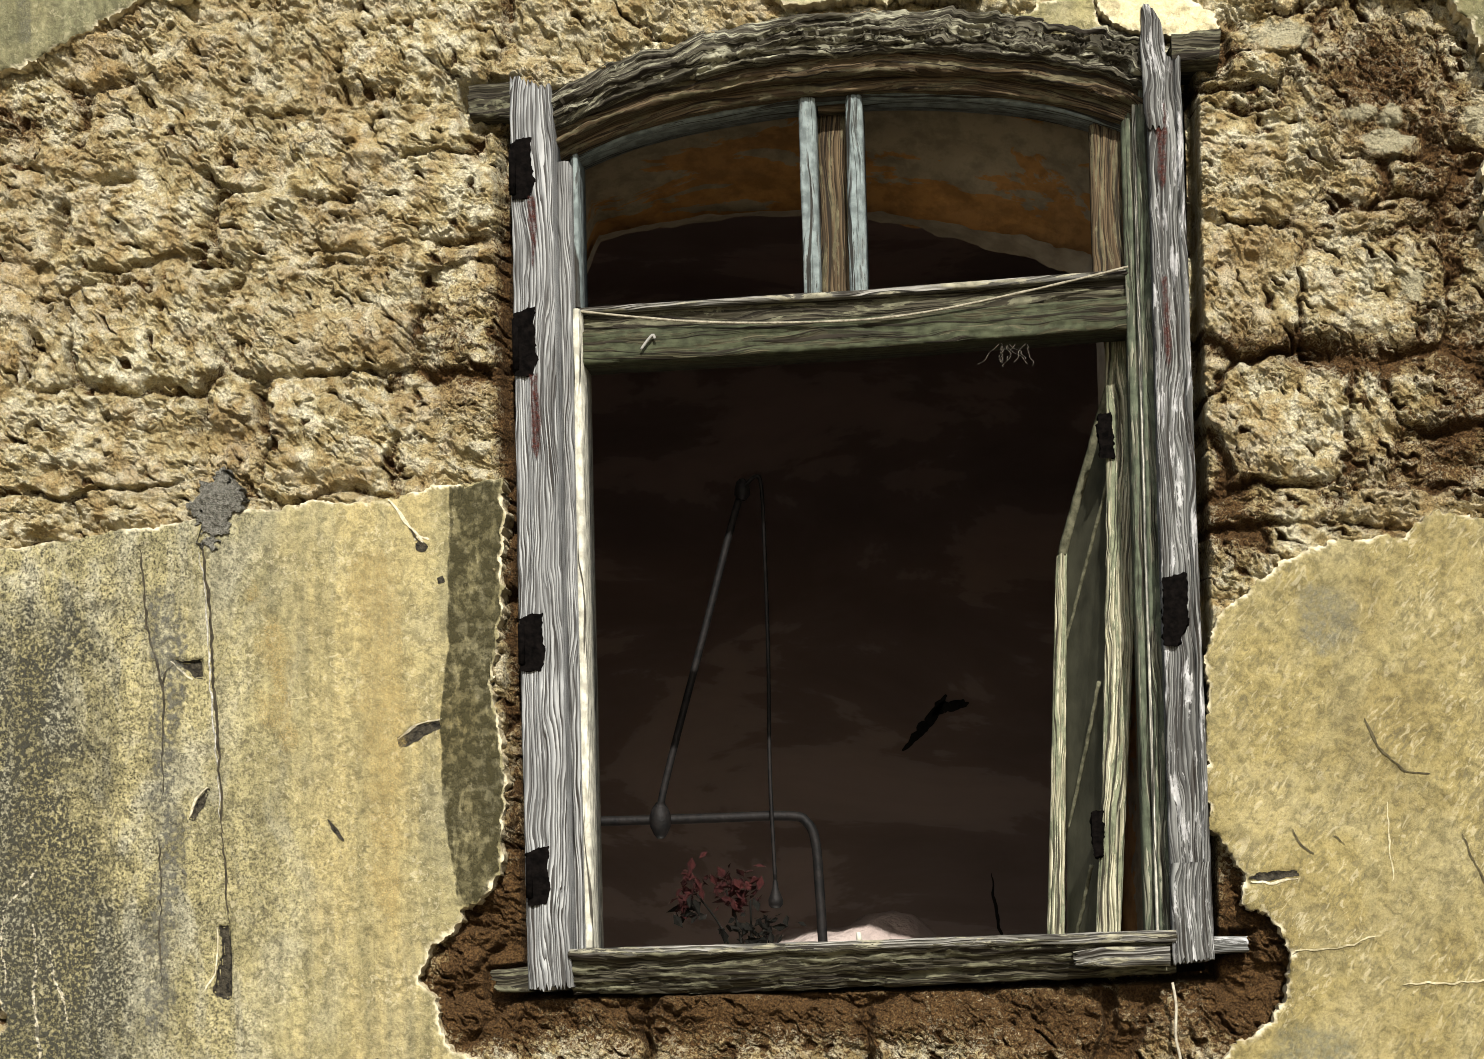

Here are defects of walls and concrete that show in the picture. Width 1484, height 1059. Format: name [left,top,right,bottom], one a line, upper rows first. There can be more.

flaking render [0,0,1484,658]
crack [155,839,163,986]
crack [139,548,230,923]
peeling [171,659,203,680]
flaking render [420,571,1290,1059]
peeling [1249,870,1299,885]